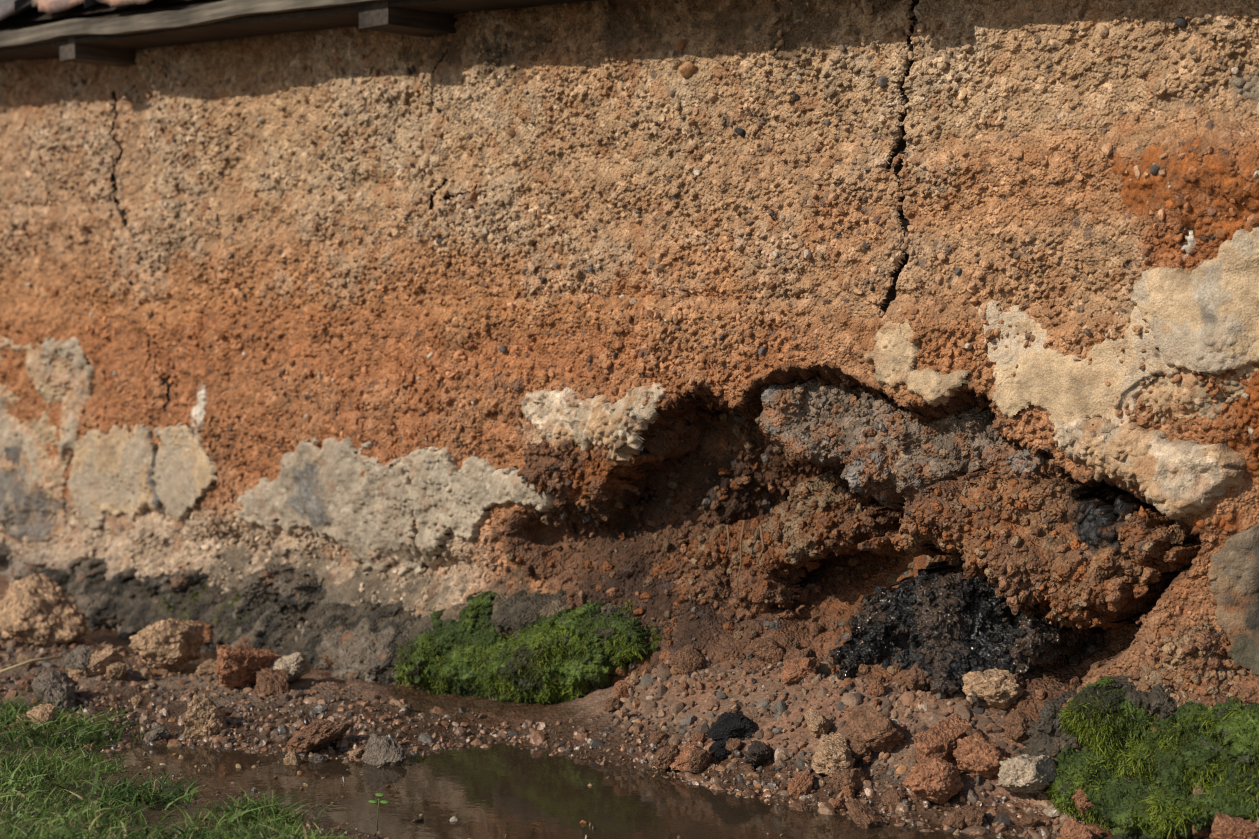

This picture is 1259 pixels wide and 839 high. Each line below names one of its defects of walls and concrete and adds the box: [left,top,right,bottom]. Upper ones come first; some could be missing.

crack [109,90,137,251]
crack [879,0,919,318]
flaking render [0,337,219,544]
spalling [237,225,1259,722]